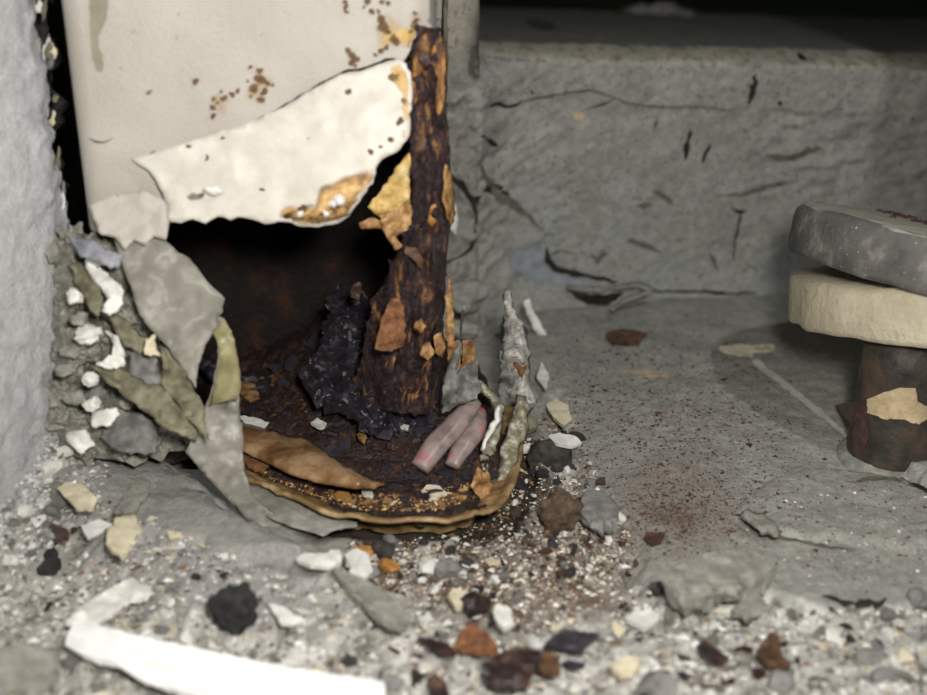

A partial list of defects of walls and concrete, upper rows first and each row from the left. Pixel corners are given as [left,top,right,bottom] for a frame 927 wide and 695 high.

rust [345,47,360,68]
rust [210,65,275,119]
crack [488,87,733,110]
peeling [131,59,413,227]
rust [350,0,456,418]
peeling [450,204,458,236]
crack [447,174,482,264]
crack [654,288,758,296]
peeling [50,476,151,542]
crack [857,476,927,493]